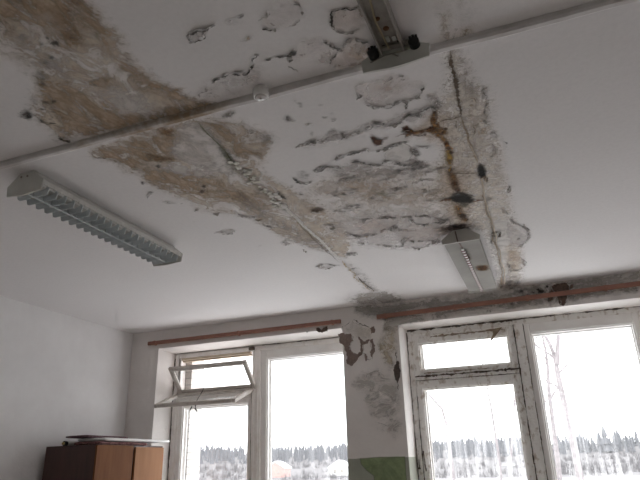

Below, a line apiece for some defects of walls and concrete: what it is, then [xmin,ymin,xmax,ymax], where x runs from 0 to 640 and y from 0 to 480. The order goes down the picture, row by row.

leakage [0,0,211,143]
peeling [323,6,368,67]
leakage [93,121,350,257]
crack [200,124,374,292]
peeling [289,50,531,287]
corrosion [401,112,460,192]
corrosion [440,198,472,232]
crack [441,50,505,284]
leakage [353,277,529,327]
flaking render [533,283,573,306]
flaking render [338,320,375,366]
flaking render [393,353,401,389]